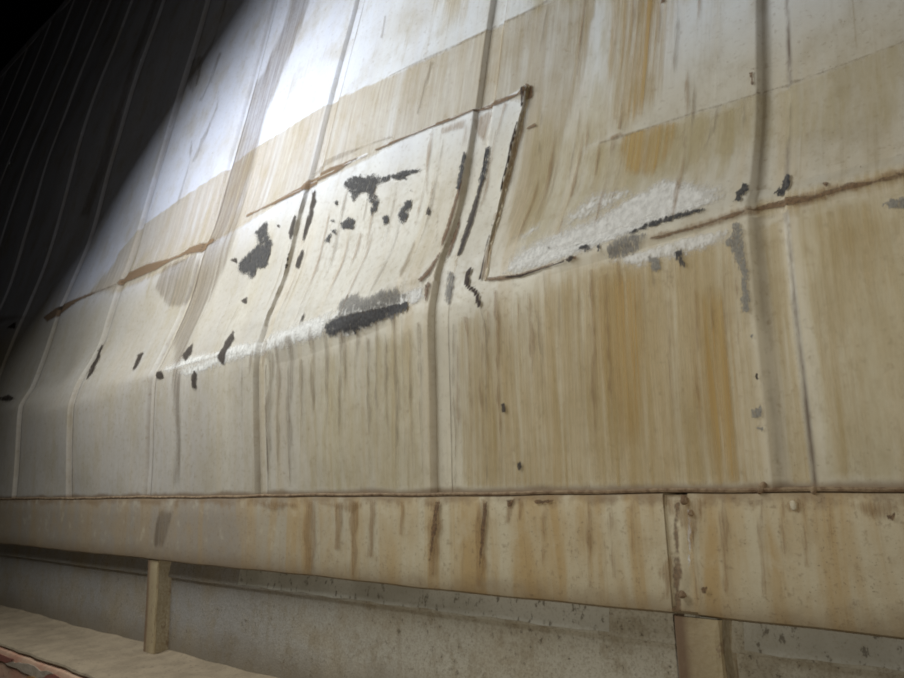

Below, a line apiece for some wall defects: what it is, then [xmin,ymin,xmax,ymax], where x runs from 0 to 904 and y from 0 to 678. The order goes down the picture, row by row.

corrosion [375,87,528,150]
corrosion [246,155,365,216]
corrosion [650,173,903,239]
peeling [774,174,790,196]
peeling [882,197,904,209]
corrosion [44,238,214,321]
peeling [156,146,490,388]
peeling [507,180,750,312]
peeling [86,343,103,379]
corrosion [430,502,440,555]
corrosion [479,503,487,564]
corrosion [673,502,691,611]